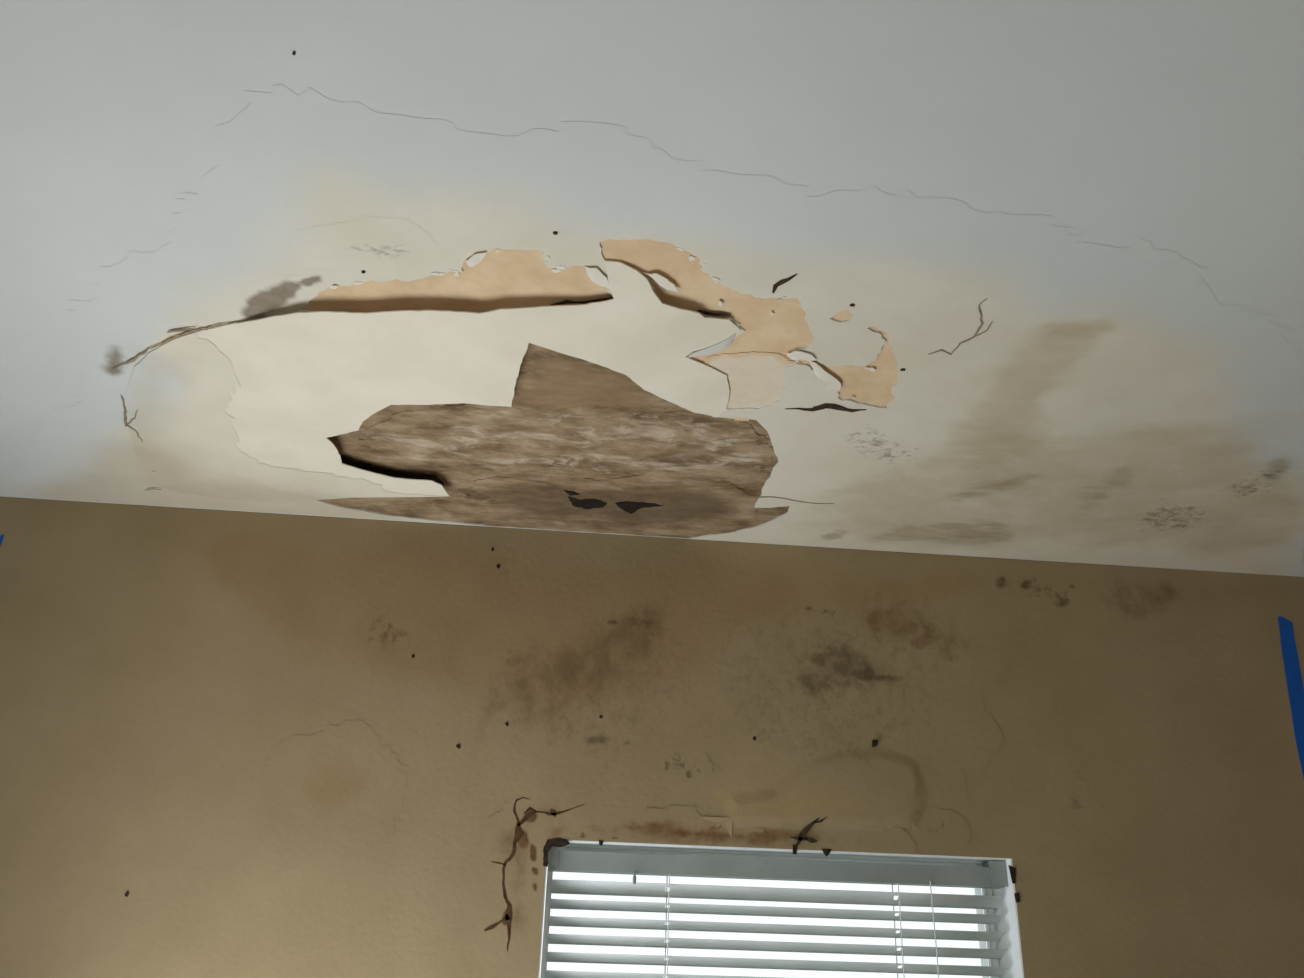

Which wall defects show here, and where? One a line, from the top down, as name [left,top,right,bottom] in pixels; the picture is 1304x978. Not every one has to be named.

crack [113,321,244,491]
spalling [341,455,444,485]
peeling [301,239,905,422]
spalling [564,490,663,514]
water stain [70,84,1304,644]
crack [928,299,993,355]
water stain [0,309,1024,968]
crack [484,797,585,951]